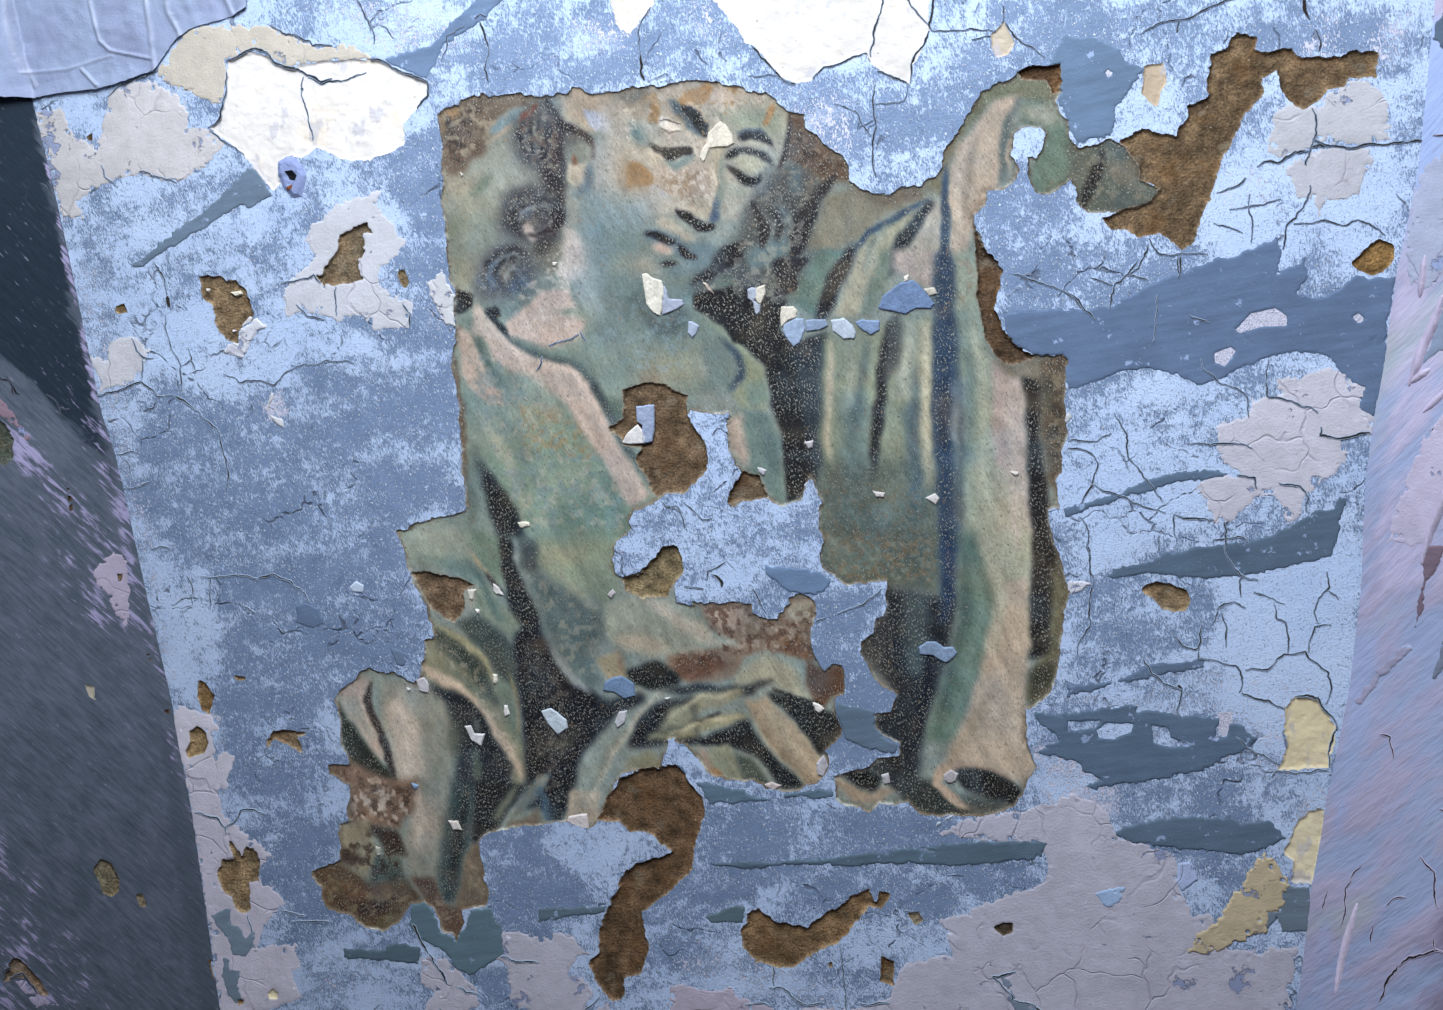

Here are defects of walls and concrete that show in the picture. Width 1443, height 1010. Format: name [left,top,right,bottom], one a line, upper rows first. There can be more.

crack [0,262,354,494]
peeling [36,24,427,221]
peeling [283,190,413,331]
crack [402,303,411,326]
flaking render [608,381,708,497]
crack [1012,108,1443,342]
flaking render [1102,32,1392,250]
crack [1187,358,1370,511]
crack [1068,415,1339,778]
flaking render [496,744,705,1010]
flaking render [740,889,890,968]
peeling [801,793,1303,1010]